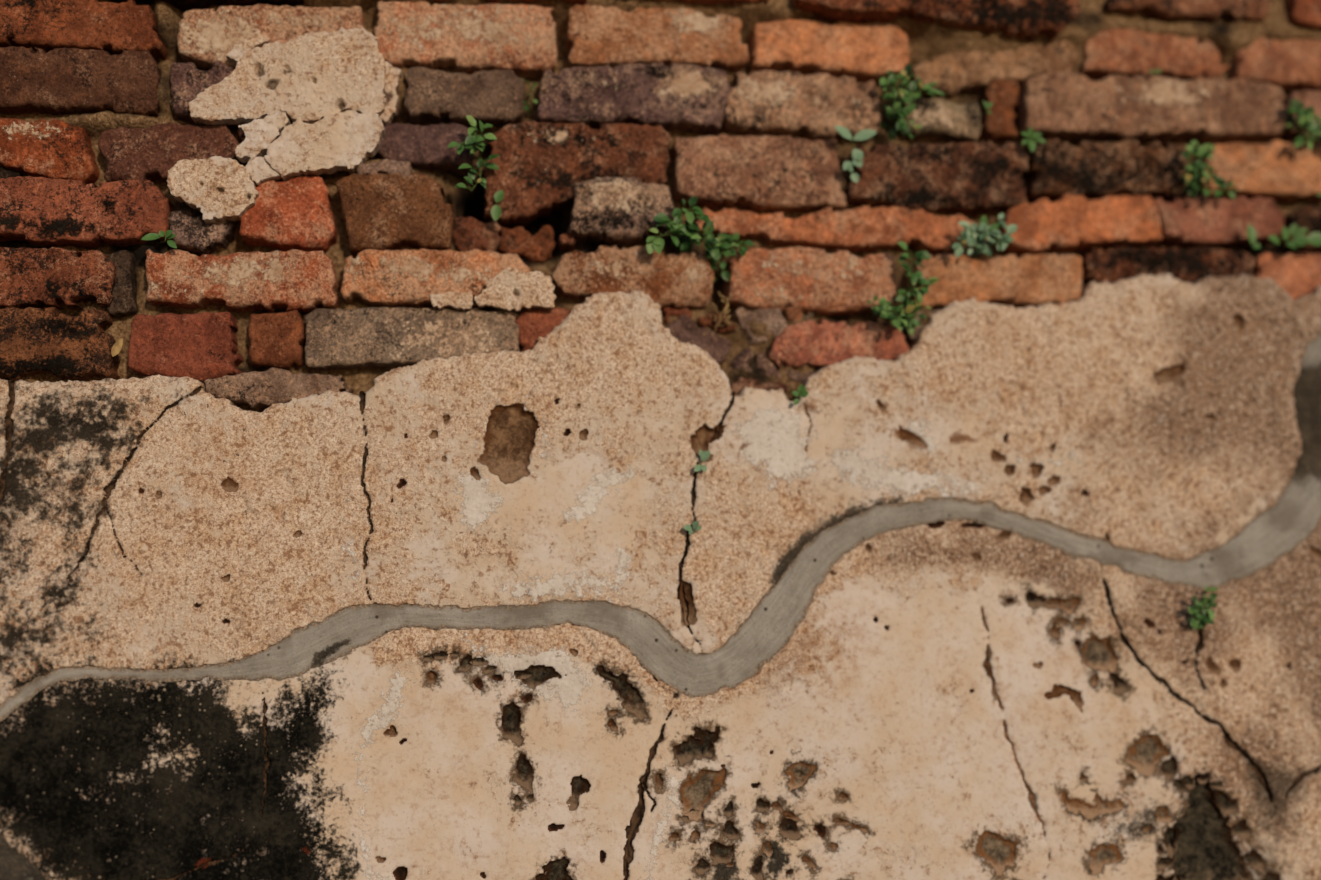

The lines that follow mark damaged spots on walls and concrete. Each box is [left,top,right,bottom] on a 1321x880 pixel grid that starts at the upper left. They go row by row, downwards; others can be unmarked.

peeling [167,27,402,224]
crack [66,386,202,580]
damp [0,260,407,880]
crack [359,391,373,600]
damp [373,309,510,363]
peeling [430,267,556,312]
spalling [564,429,588,440]
crack [677,391,735,645]
spalling [1154,363,1186,383]
spalling [1232,313,1246,335]
crack [623,646,678,880]
crack [1102,578,1321,810]